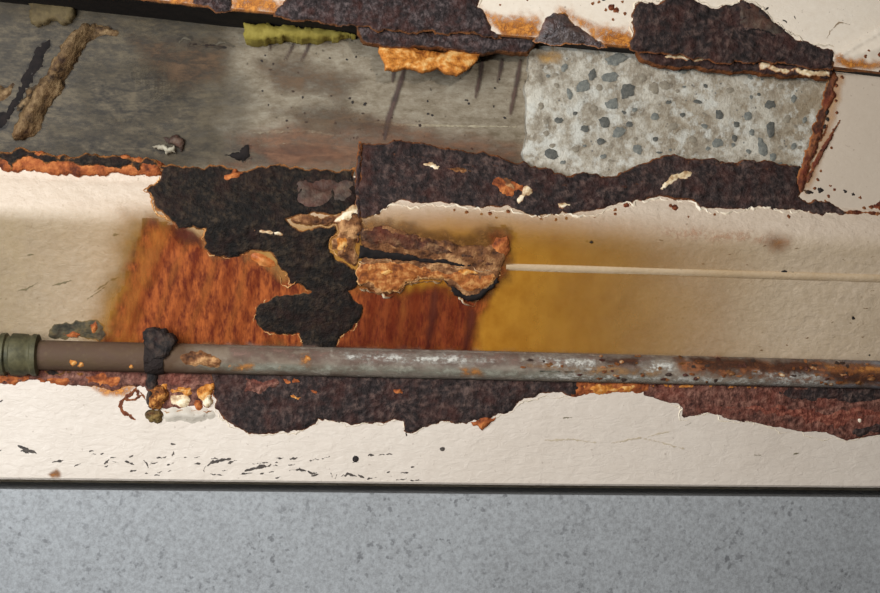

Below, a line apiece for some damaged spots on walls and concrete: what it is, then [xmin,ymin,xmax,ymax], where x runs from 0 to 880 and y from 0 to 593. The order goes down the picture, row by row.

peeling [0,23,119,141]
spalling [521,45,828,177]
peeling [336,238,348,252]
peeling [334,204,358,223]
peeling [355,221,511,307]
rust [0,0,880,442]
peeling [156,373,215,414]